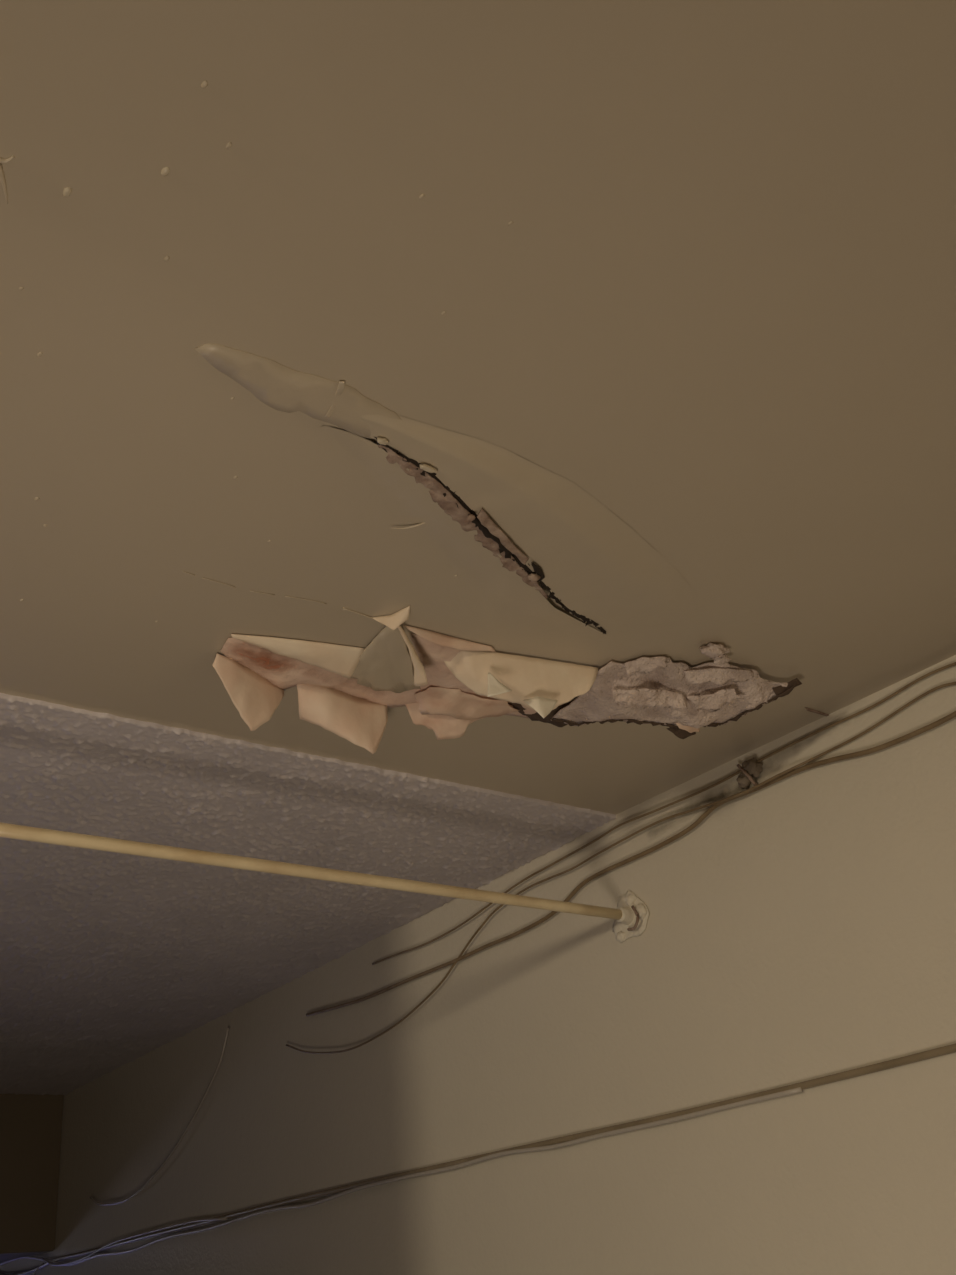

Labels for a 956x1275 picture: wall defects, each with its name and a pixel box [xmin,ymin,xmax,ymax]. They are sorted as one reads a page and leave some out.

crack [375,437,606,634]
peeling [213,606,802,754]